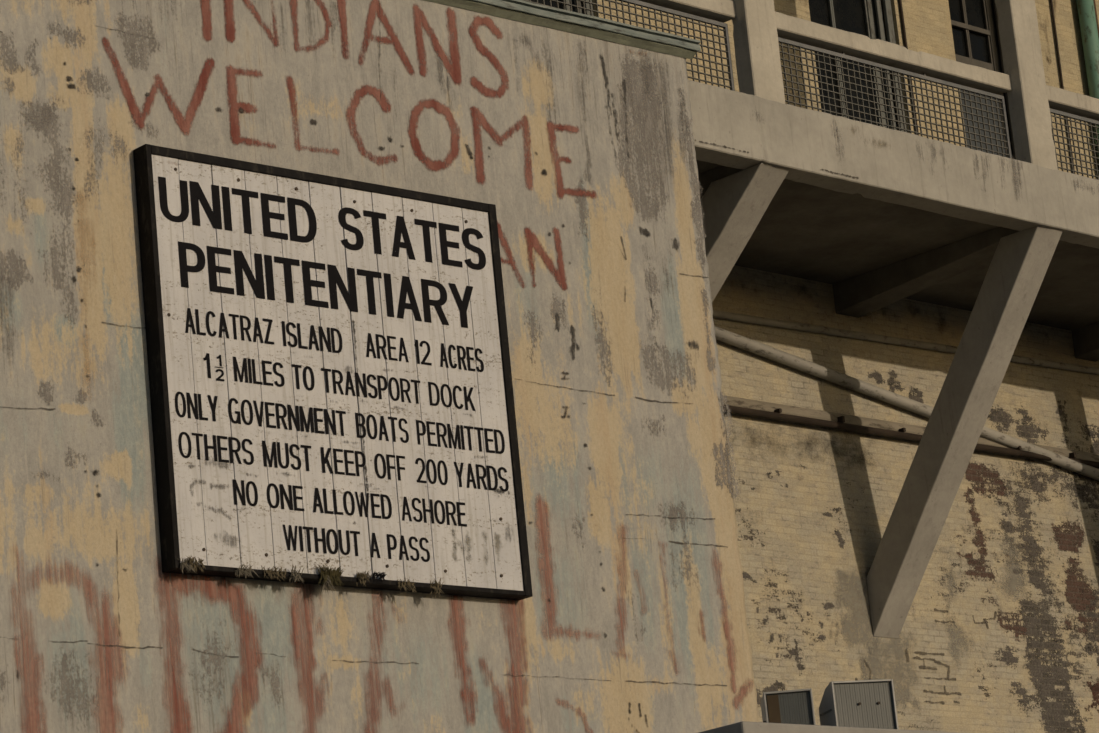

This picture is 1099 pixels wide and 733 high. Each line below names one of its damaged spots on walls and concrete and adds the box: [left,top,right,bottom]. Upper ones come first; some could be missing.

peeling [615,57,666,222]
peeling [643,88,715,396]
peeling [713,392,765,547]
peeling [868,370,923,403]
peeling [987,405,1049,444]
peeling [1056,400,1099,454]
peeling [742,569,835,676]
peeling [930,455,1099,733]
peeling [756,680,785,706]